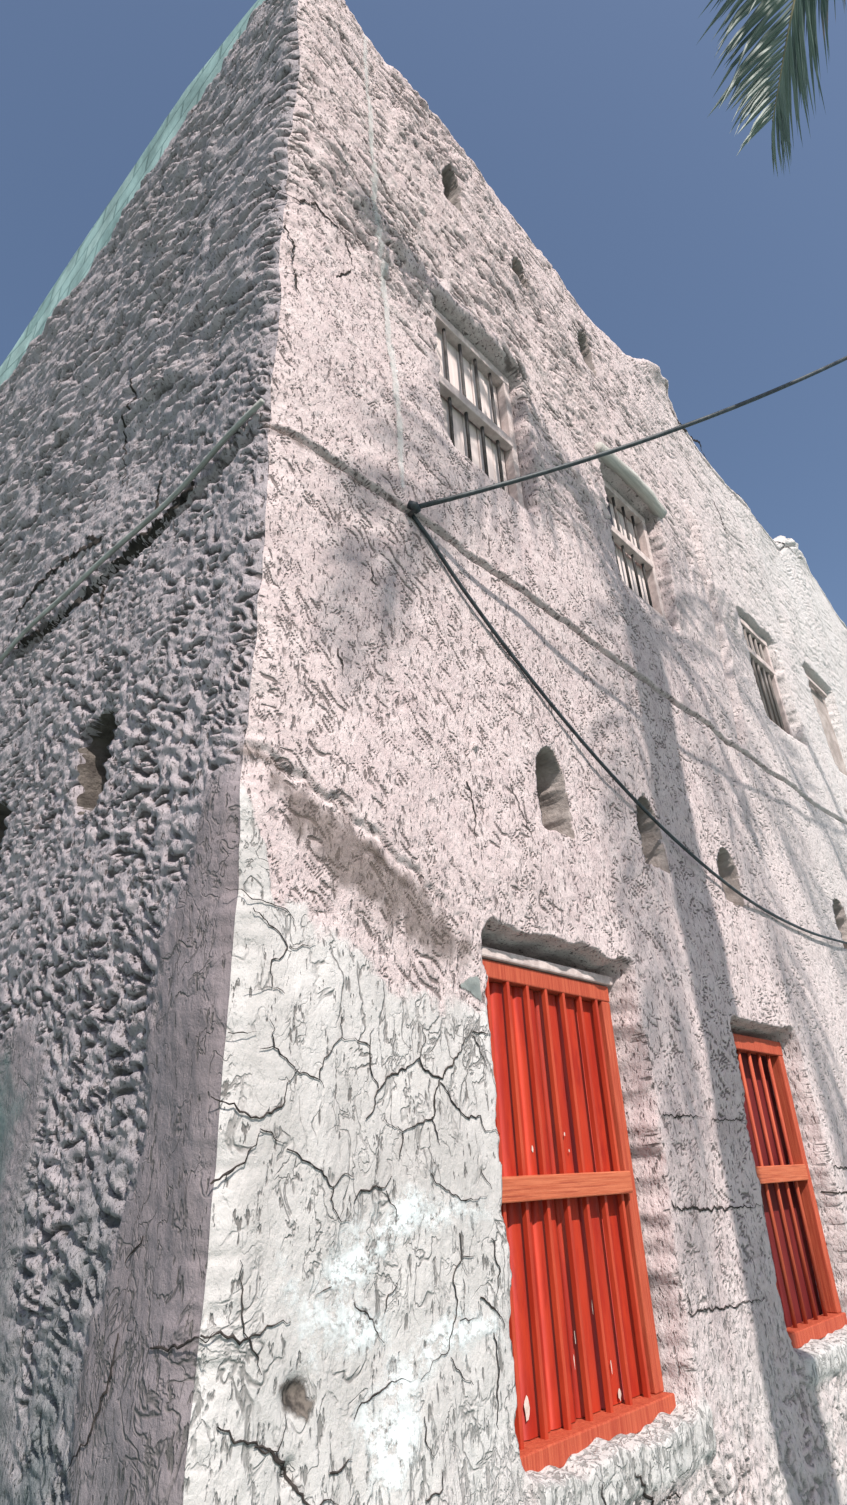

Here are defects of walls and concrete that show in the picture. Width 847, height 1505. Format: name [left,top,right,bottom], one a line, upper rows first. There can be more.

crack [3,378,194,693]
crack [210,888,505,1430]
crack [821,1165,847,1194]
crack [66,1260,290,1472]
crack [217,1415,352,1505]
crack [424,1416,444,1502]